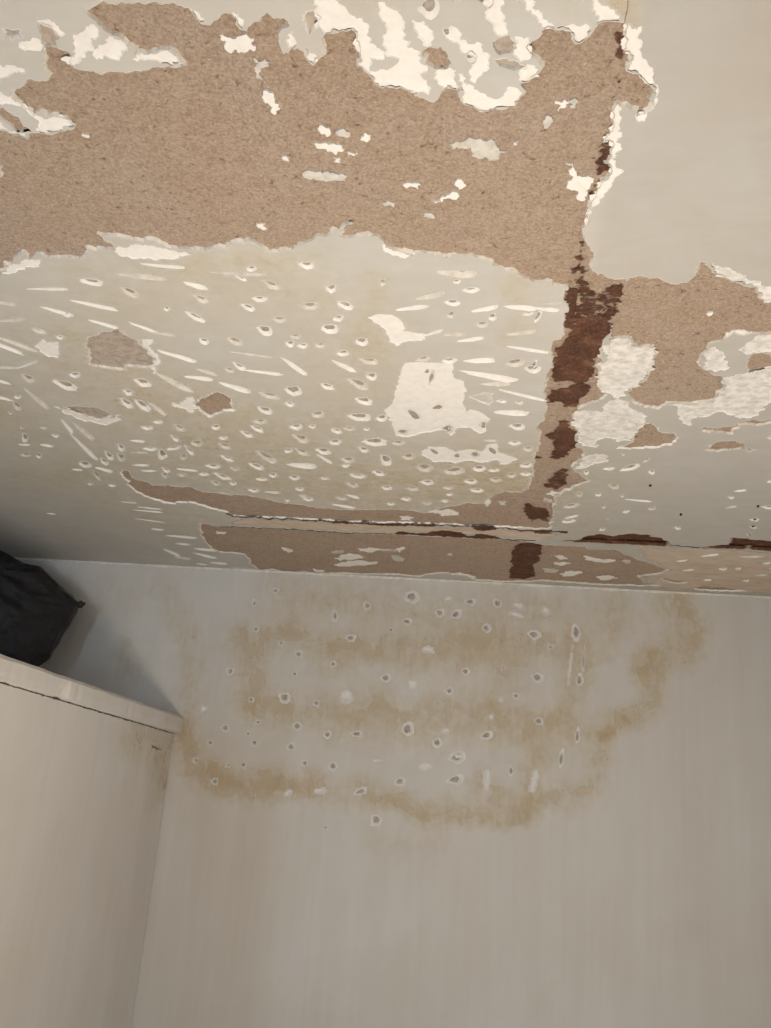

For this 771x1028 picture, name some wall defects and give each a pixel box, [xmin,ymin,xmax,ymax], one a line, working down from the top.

rust [613,32,623,59]
rust [588,141,612,200]
flaking render [0,0,771,593]
rust [547,241,623,407]
rust [535,421,578,490]
rust [701,537,771,552]